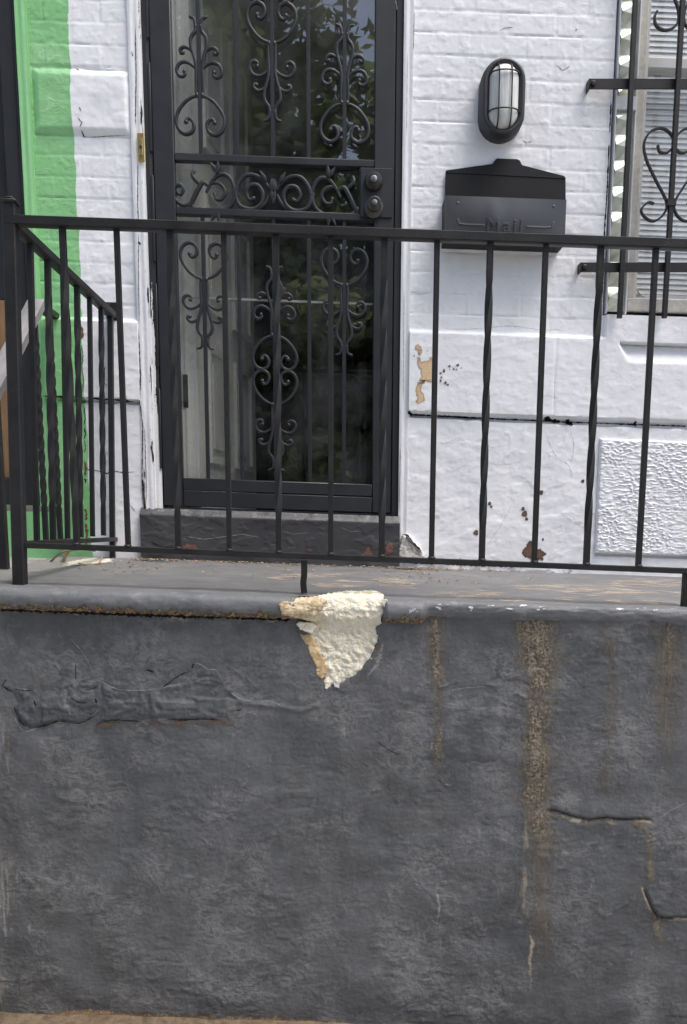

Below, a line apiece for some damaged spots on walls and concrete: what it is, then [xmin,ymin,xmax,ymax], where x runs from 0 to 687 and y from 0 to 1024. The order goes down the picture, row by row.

peeling [403,332,459,403]
spalling [279,574,416,689]
crack [547,803,687,943]